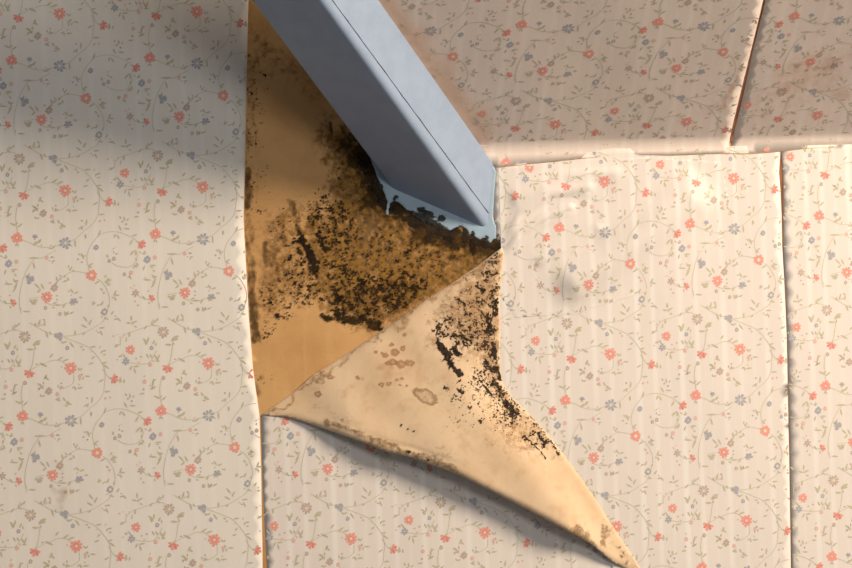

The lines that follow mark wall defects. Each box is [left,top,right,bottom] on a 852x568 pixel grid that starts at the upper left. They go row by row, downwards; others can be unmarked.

peeling [244,0,487,417]
water stain [245,122,560,459]